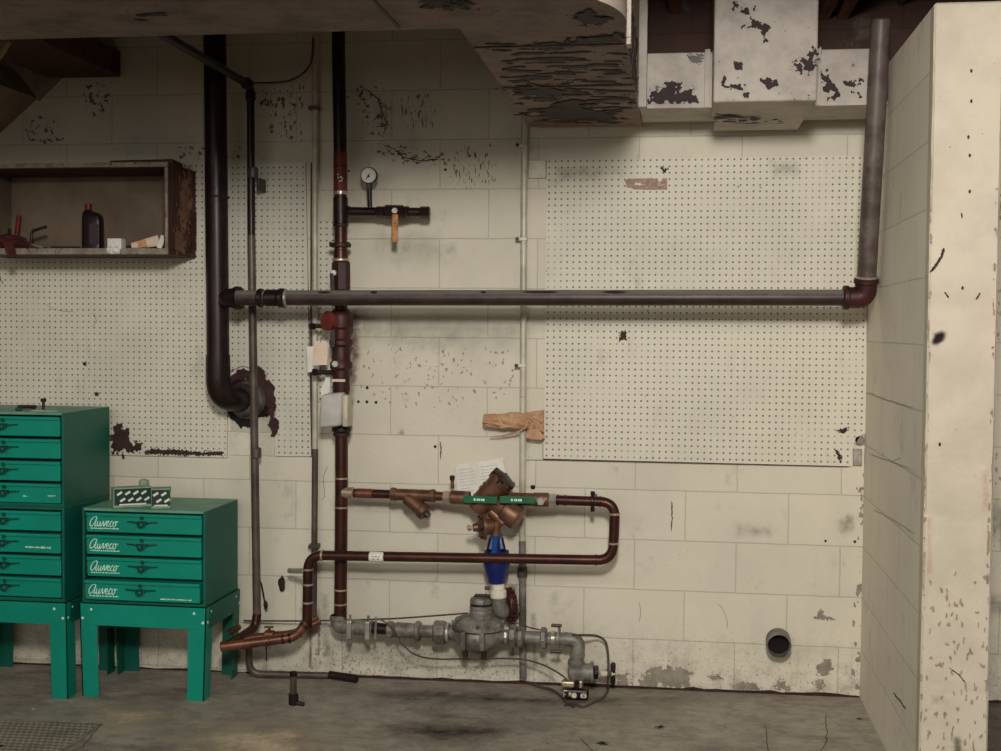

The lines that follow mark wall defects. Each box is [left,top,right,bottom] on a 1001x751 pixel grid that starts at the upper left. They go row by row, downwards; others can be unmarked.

peeling [732,1,776,43]
peeling [485,0,699,124]
peeling [721,61,750,98]
peeling [760,77,779,94]
peeling [791,46,865,101]
spalling [227,366,279,437]
spalling [974,499,1001,584]
peeling [920,552,989,751]
spalling [616,664,694,688]
spalling [707,674,791,692]
spalling [812,659,834,691]